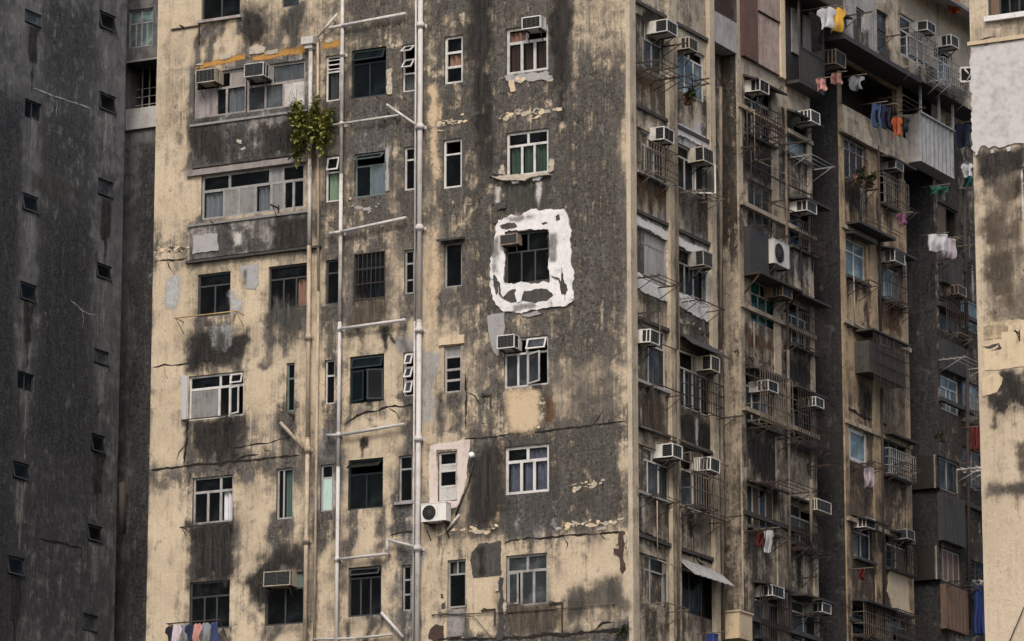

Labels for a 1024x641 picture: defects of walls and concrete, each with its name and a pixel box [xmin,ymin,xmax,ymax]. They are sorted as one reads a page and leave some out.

flaking render [501,70,554,92]
spalling [499,107,563,121]
flaking render [427,84,468,205]
peeling [515,286,524,303]
crack [153,360,212,379]
crack [346,404,416,424]
crack [464,375,624,444]
crack [150,420,300,484]
flaking render [572,479,605,493]
crack [505,529,712,565]